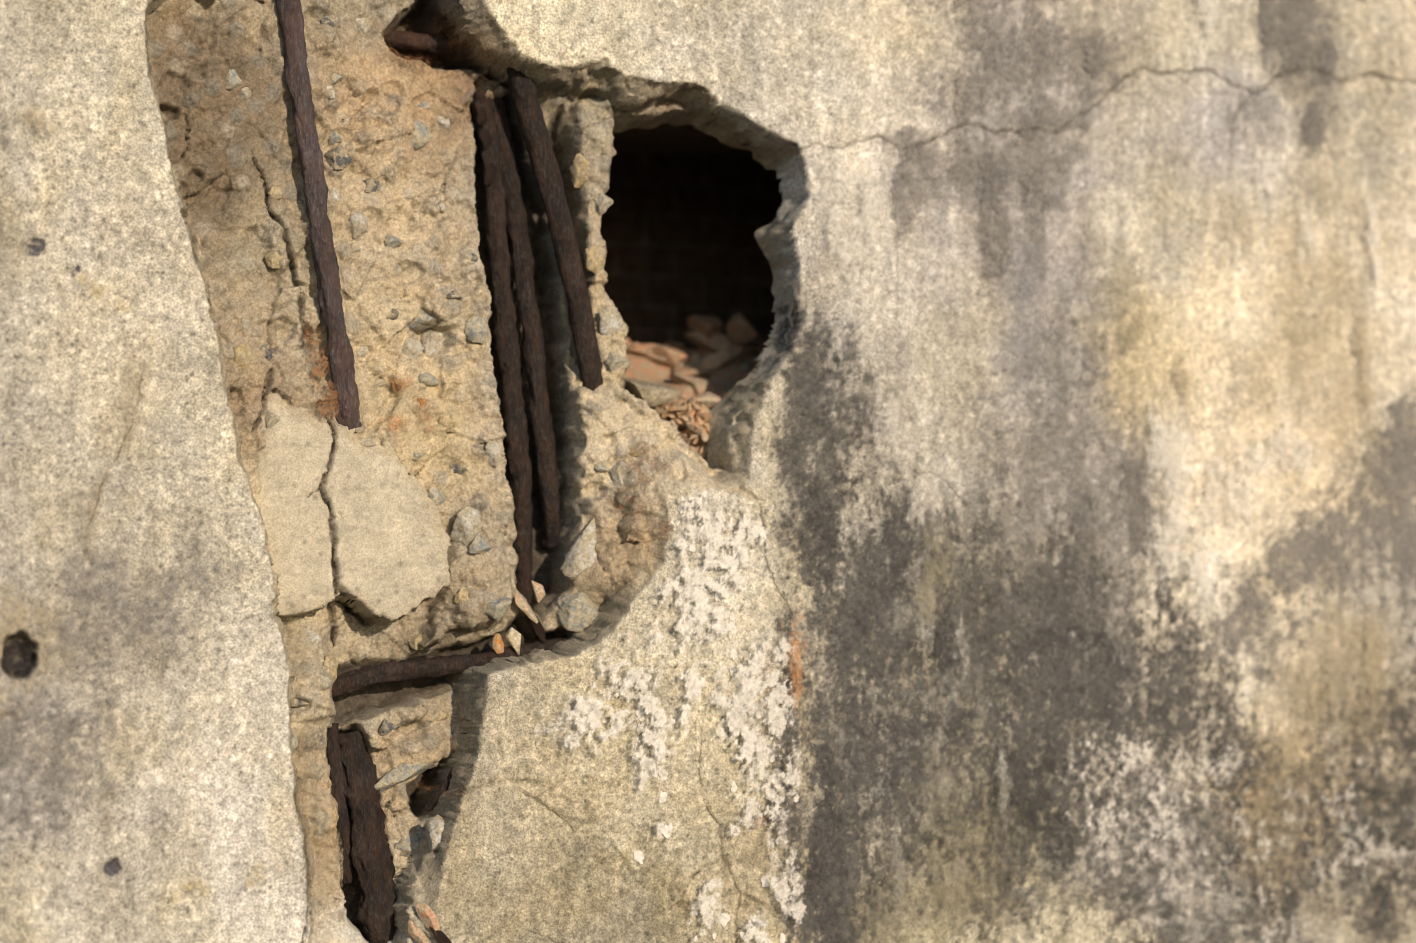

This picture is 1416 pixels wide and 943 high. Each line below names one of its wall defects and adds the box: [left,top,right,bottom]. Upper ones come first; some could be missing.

crack [251,150,310,339]
leakage [885,0,1125,305]
leakage [1244,0,1340,150]
leakage [1366,201,1382,282]
corrosion [304,328,339,418]
crack [319,414,351,646]
spalling [144,0,806,943]
leakage [752,295,1416,943]